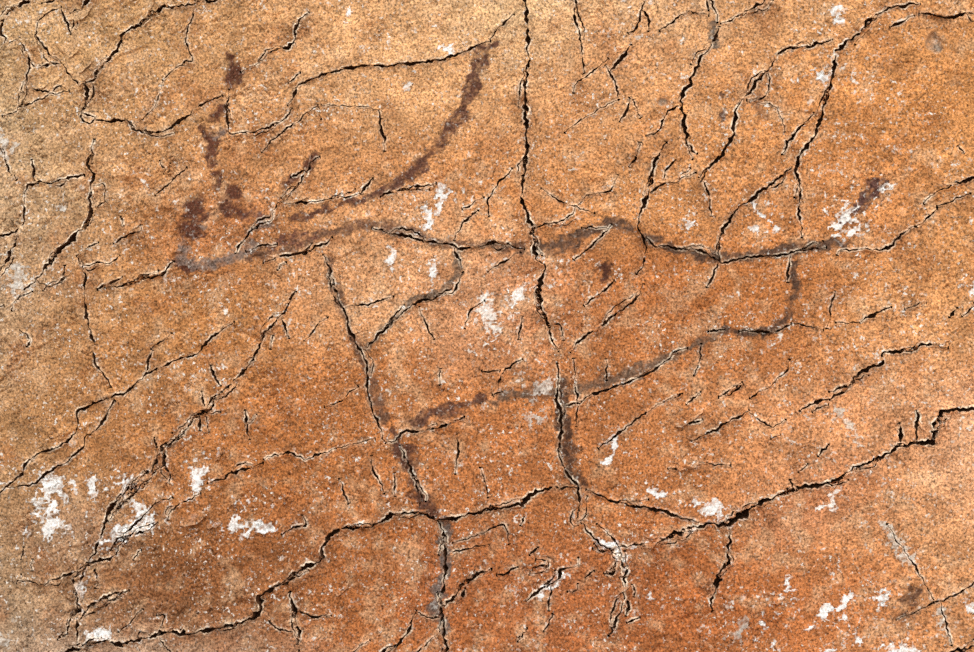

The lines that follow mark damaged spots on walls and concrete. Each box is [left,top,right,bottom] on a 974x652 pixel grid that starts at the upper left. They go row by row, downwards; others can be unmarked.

crack [0,140,234,496]
crack [0,0,514,153]
crack [235,154,373,271]
crack [322,0,619,444]
crack [564,0,643,134]
crack [628,0,974,287]
crack [15,280,974,652]